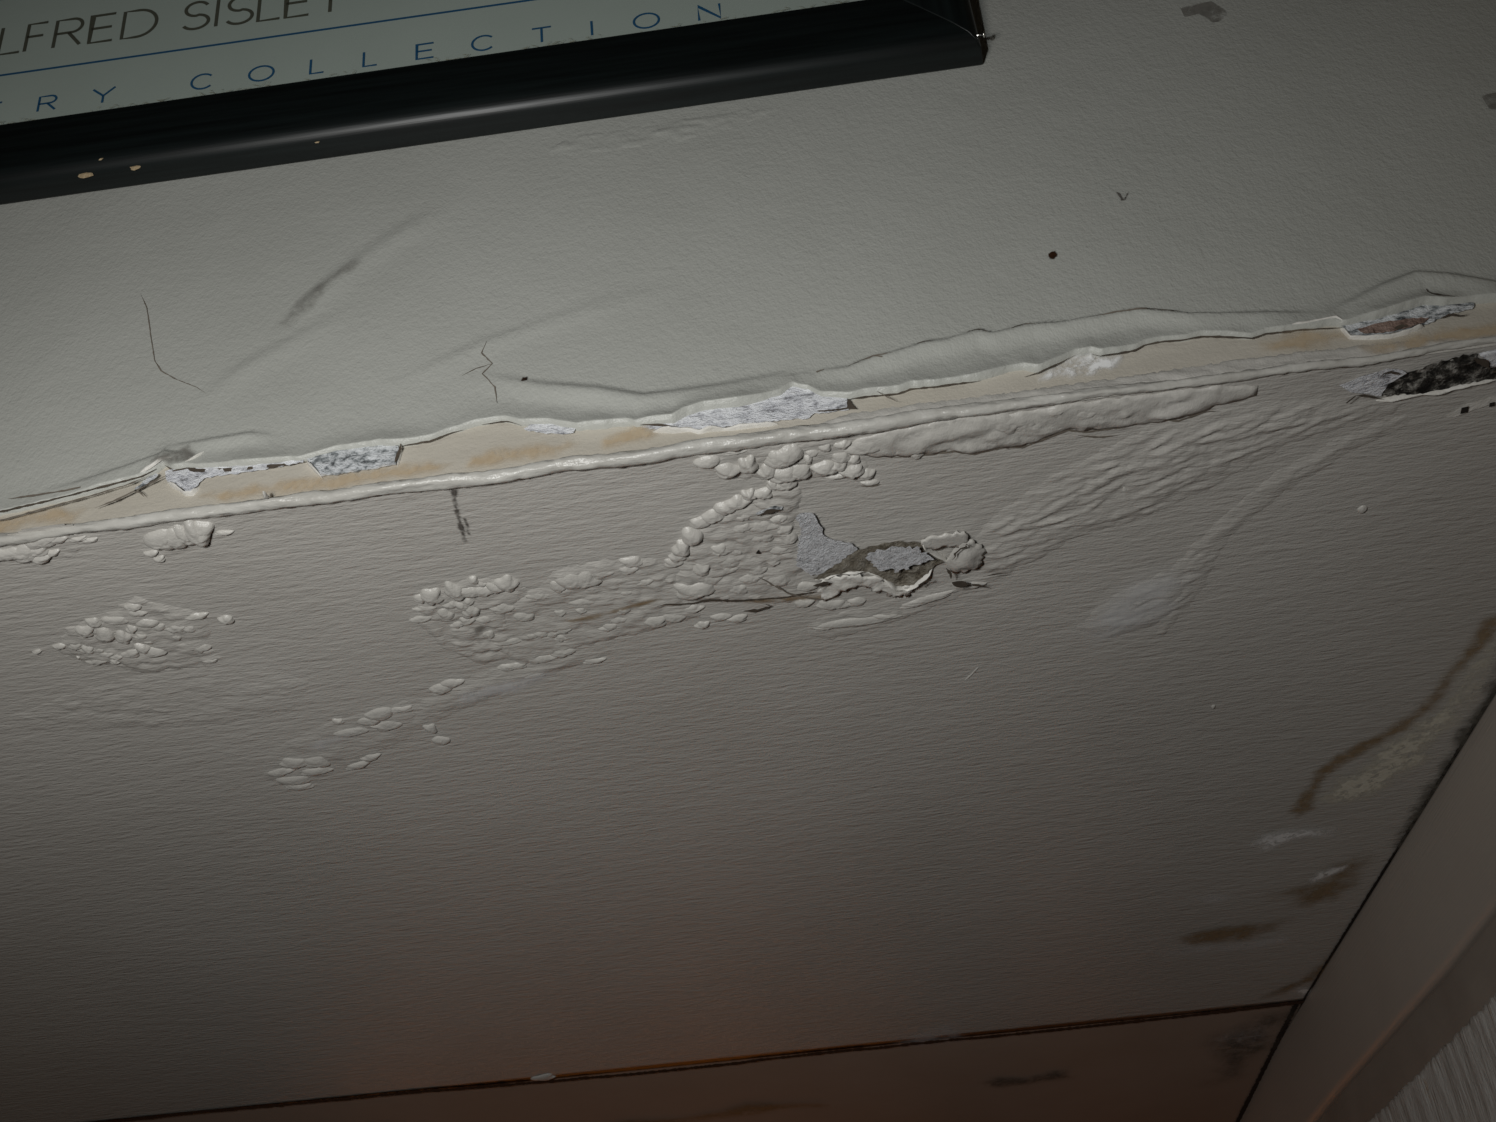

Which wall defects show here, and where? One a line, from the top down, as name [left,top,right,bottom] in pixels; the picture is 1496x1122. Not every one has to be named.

crack [142,298,202,391]
crack [395,343,519,462]
spalling [524,424,575,434]
spalling [641,387,856,434]
crack [816,323,1030,402]
crack [1025,307,1342,377]
spalling [1340,289,1474,340]
spalling [1340,349,1496,417]
crack [0,451,309,521]
spalling [135,445,403,496]
damp [1294,619,1496,847]